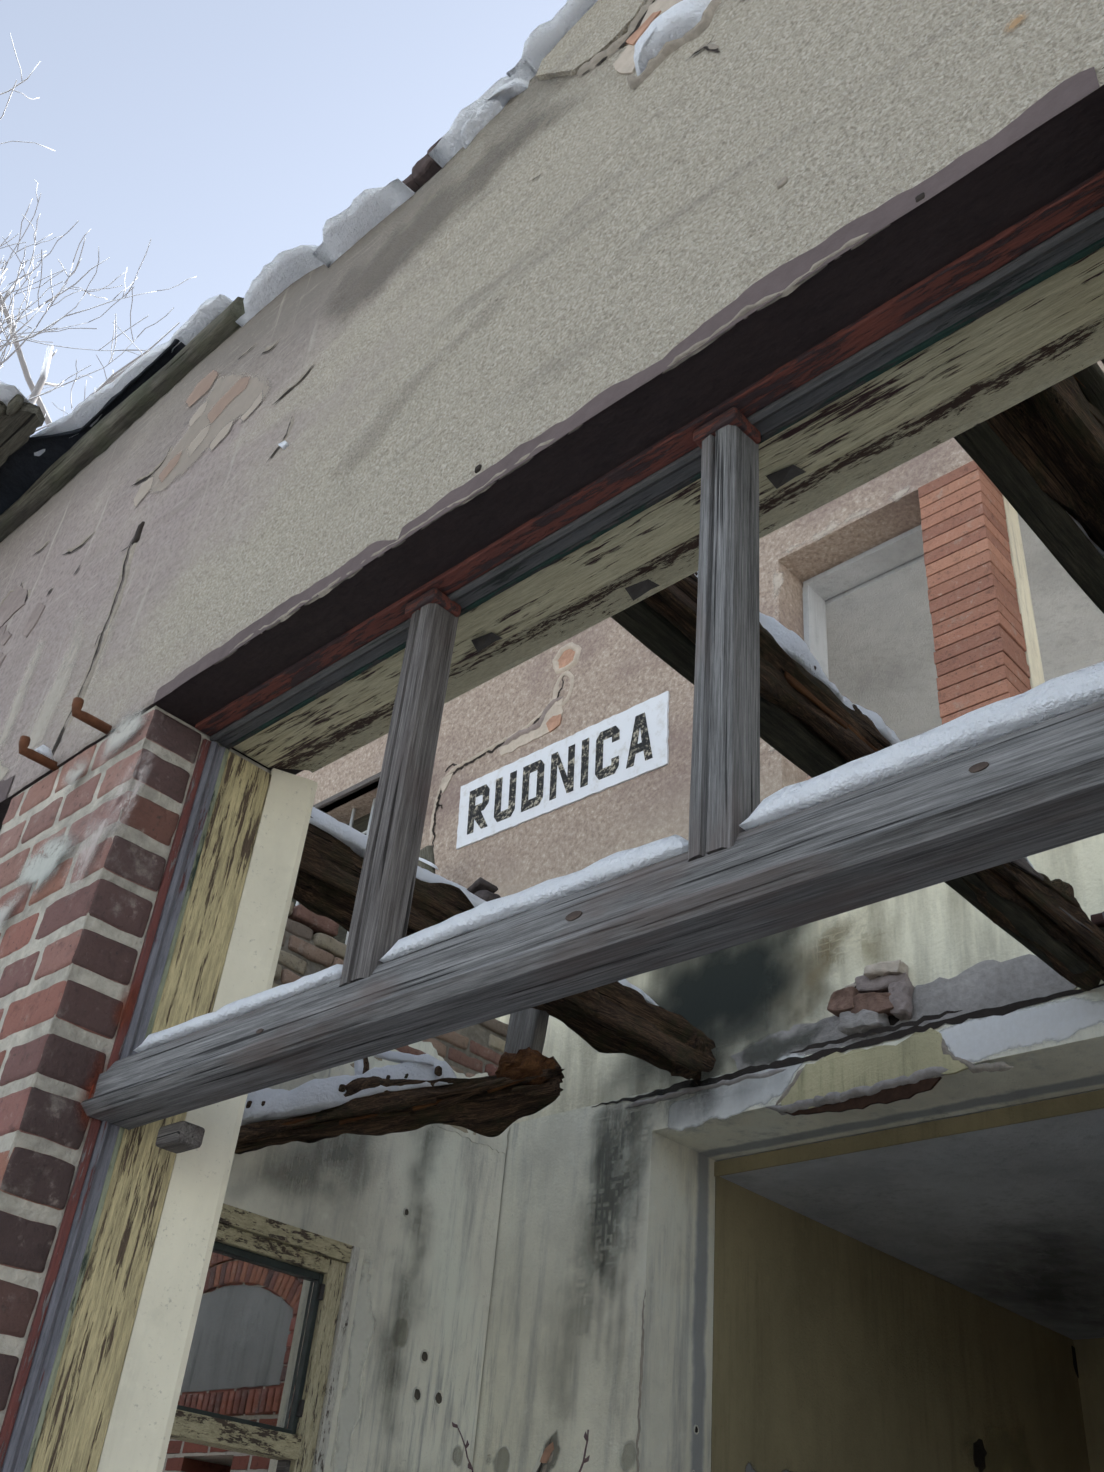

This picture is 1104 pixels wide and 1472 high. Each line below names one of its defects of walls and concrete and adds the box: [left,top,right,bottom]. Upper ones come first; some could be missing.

crack [535,0,655,80]
spalling [612,0,721,90]
spalling [662,224,891,374]
crack [132,446,173,486]
peeling [133,370,269,506]
spalling [214,424,583,665]
peeling [0,586,45,666]
crack [20,521,145,753]
crack [429,676,564,847]
crack [593,983,1104,1109]
spalling [668,960,1104,1130]
leakage [591,1107,638,1271]